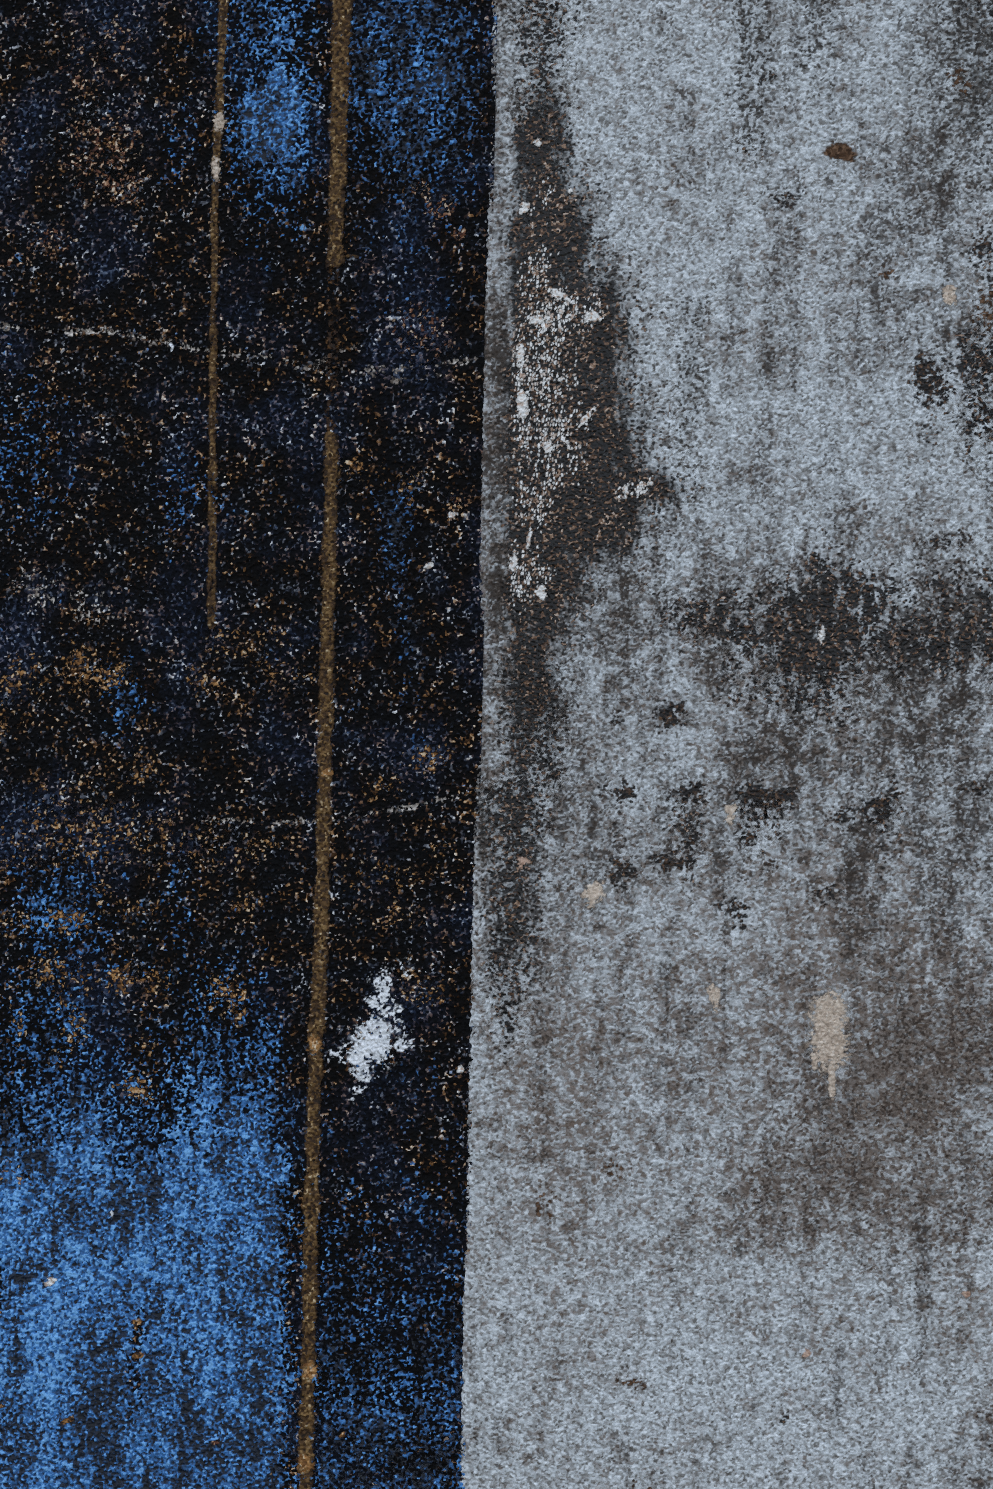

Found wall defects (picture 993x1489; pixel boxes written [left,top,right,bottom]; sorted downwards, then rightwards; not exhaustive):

damp [914,528,972,550]
damp [636,535,993,733]
damp [0,0,711,1489]
damp [728,778,798,873]
damp [825,774,910,877]
damp [806,884,841,907]
peeling [330,958,415,1101]